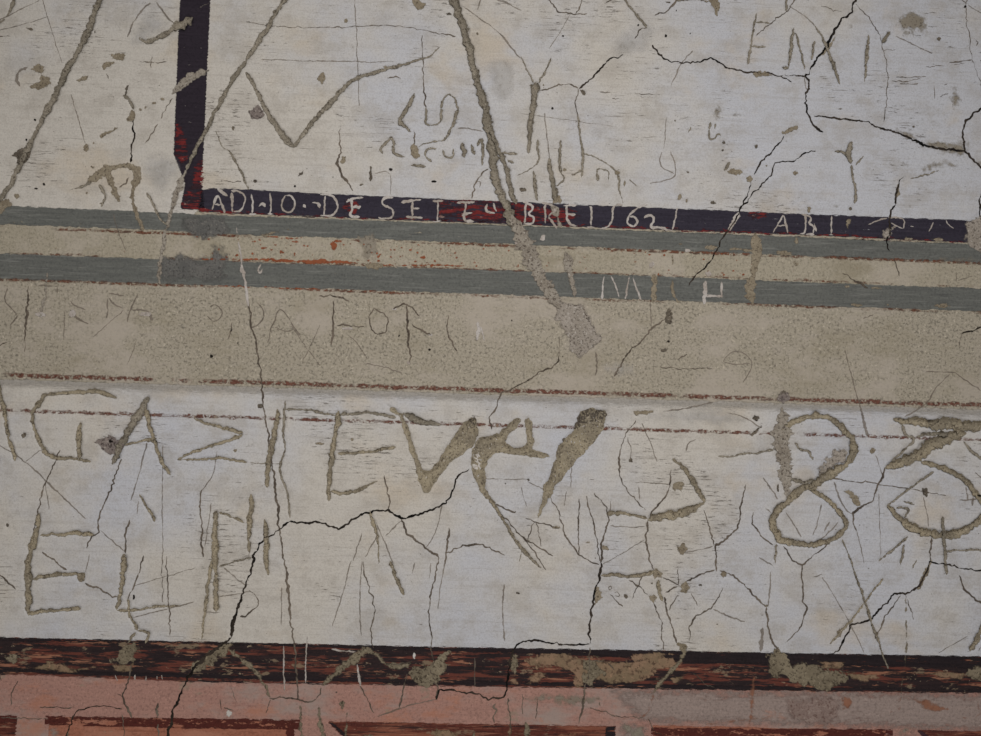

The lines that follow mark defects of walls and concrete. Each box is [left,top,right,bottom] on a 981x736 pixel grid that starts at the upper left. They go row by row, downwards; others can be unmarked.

crack [542,0,981,285]
crack [489,338,560,429]
crack [834,456,946,561]
crack [964,442,981,497]
crack [155,469,671,736]
crack [834,560,981,653]